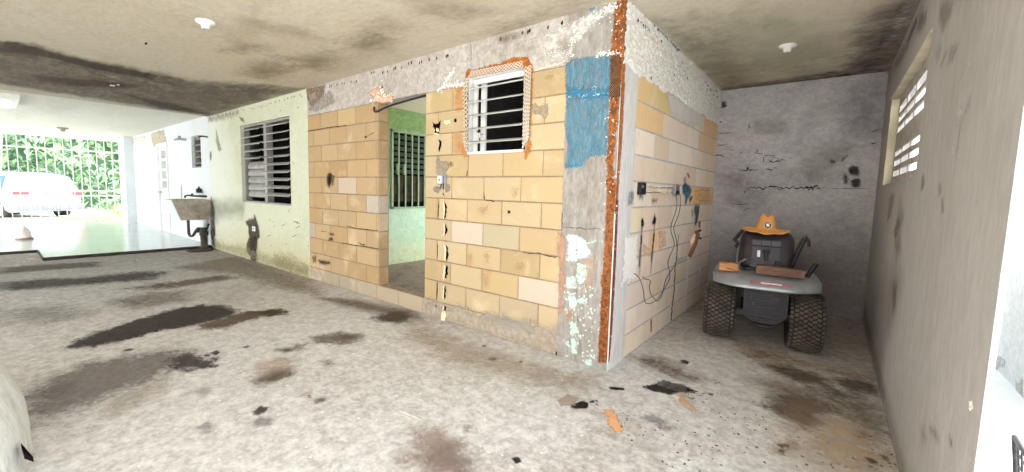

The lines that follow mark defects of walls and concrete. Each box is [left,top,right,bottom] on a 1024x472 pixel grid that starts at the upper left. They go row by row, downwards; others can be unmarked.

damp [39,77,204,114]
rust [456,57,534,159]
rust [585,0,630,363]
flaking render [543,0,727,168]
crack [716,121,869,192]
mould [728,3,912,89]
crack [435,192,449,321]
rust [558,233,573,320]
peeling [562,234,596,366]